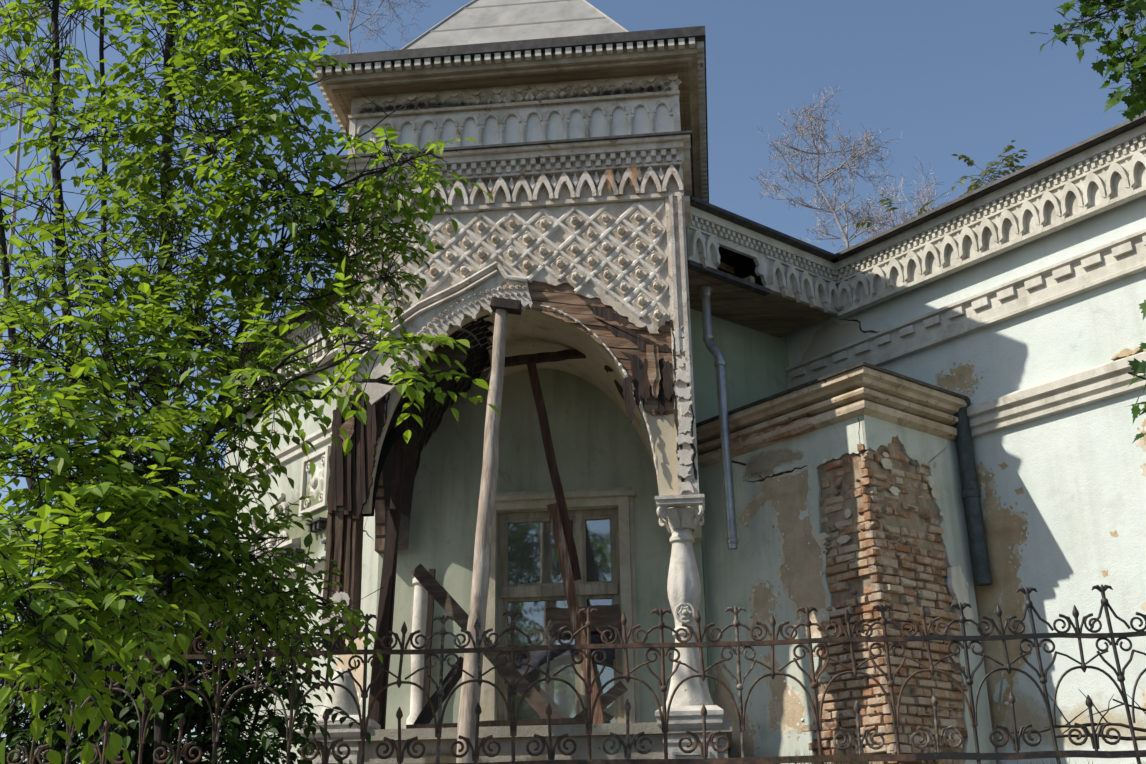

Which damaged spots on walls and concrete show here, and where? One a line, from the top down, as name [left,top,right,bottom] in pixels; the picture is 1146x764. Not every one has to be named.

crack [839,319,880,333]
flaking render [604,365,651,443]
flaking render [669,320,697,495]
peeling [935,360,983,398]
crack [744,465,808,483]
peeling [1135,418,1146,476]
flaking render [712,437,1039,764]